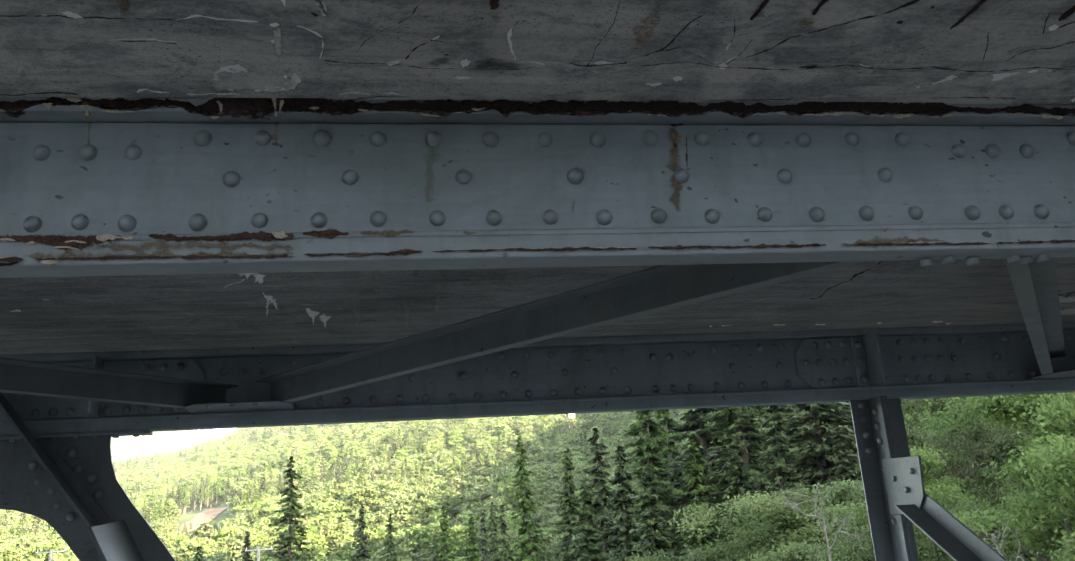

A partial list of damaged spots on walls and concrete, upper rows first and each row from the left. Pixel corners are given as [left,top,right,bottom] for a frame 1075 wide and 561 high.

crack [296,0,1075,100]
corrosion [0,96,1075,210]
corrosion [0,228,826,266]
corrosion [842,236,1075,246]
crack [809,261,882,299]